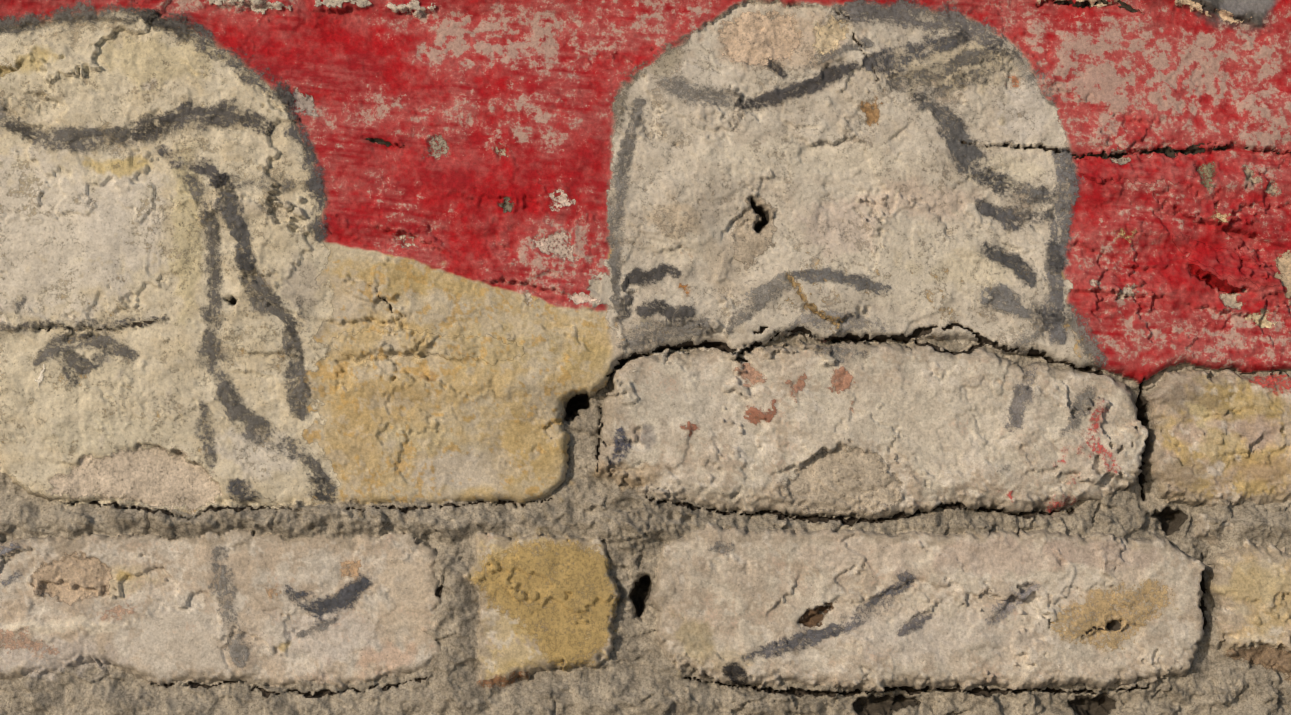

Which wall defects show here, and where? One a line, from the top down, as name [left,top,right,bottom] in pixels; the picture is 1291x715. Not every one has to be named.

peeling [209,0,292,15]
peeling [314,0,436,18]
peeling [1037,0,1119,8]
peeling [1174,0,1252,25]
spalling [718,10,849,66]
peeling [293,87,318,118]
crack [961,140,1291,159]
peeling [549,189,576,211]
peeling [532,231,579,262]
spalling [1274,250,1291,305]
peeling [568,292,601,305]
spalling [48,443,223,515]